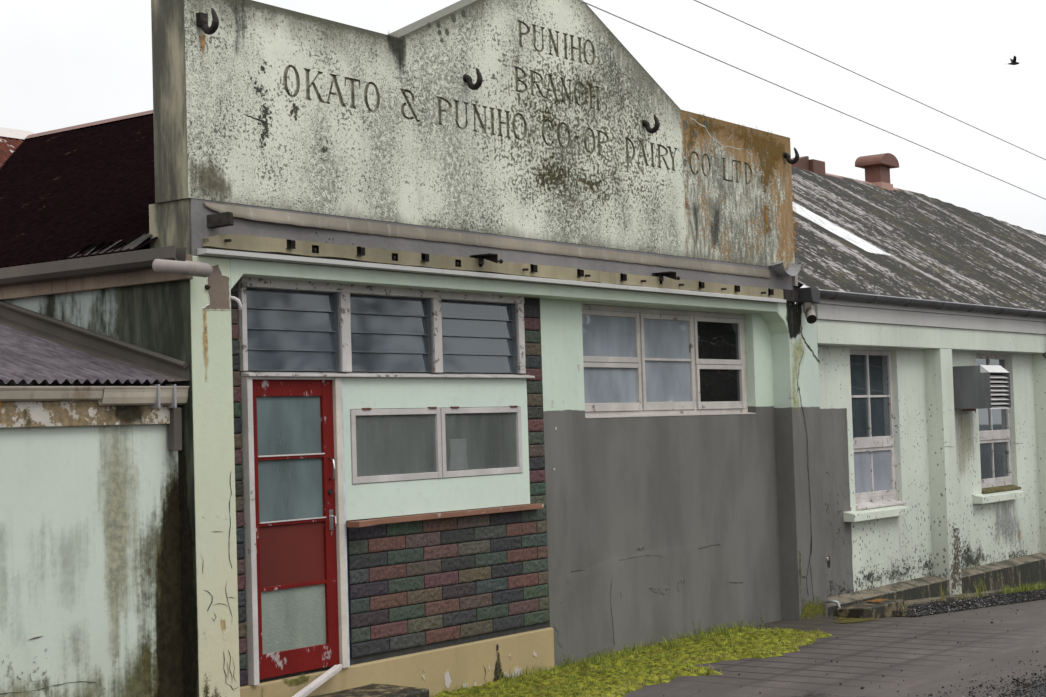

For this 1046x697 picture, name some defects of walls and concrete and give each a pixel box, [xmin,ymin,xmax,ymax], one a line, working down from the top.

damp [248,59,300,154]
damp [711,211,719,245]
damp [106,436,136,644]
damp [157,445,198,697]
damp [827,541,933,598]
damp [949,509,1028,595]
peeling [443,669,477,690]